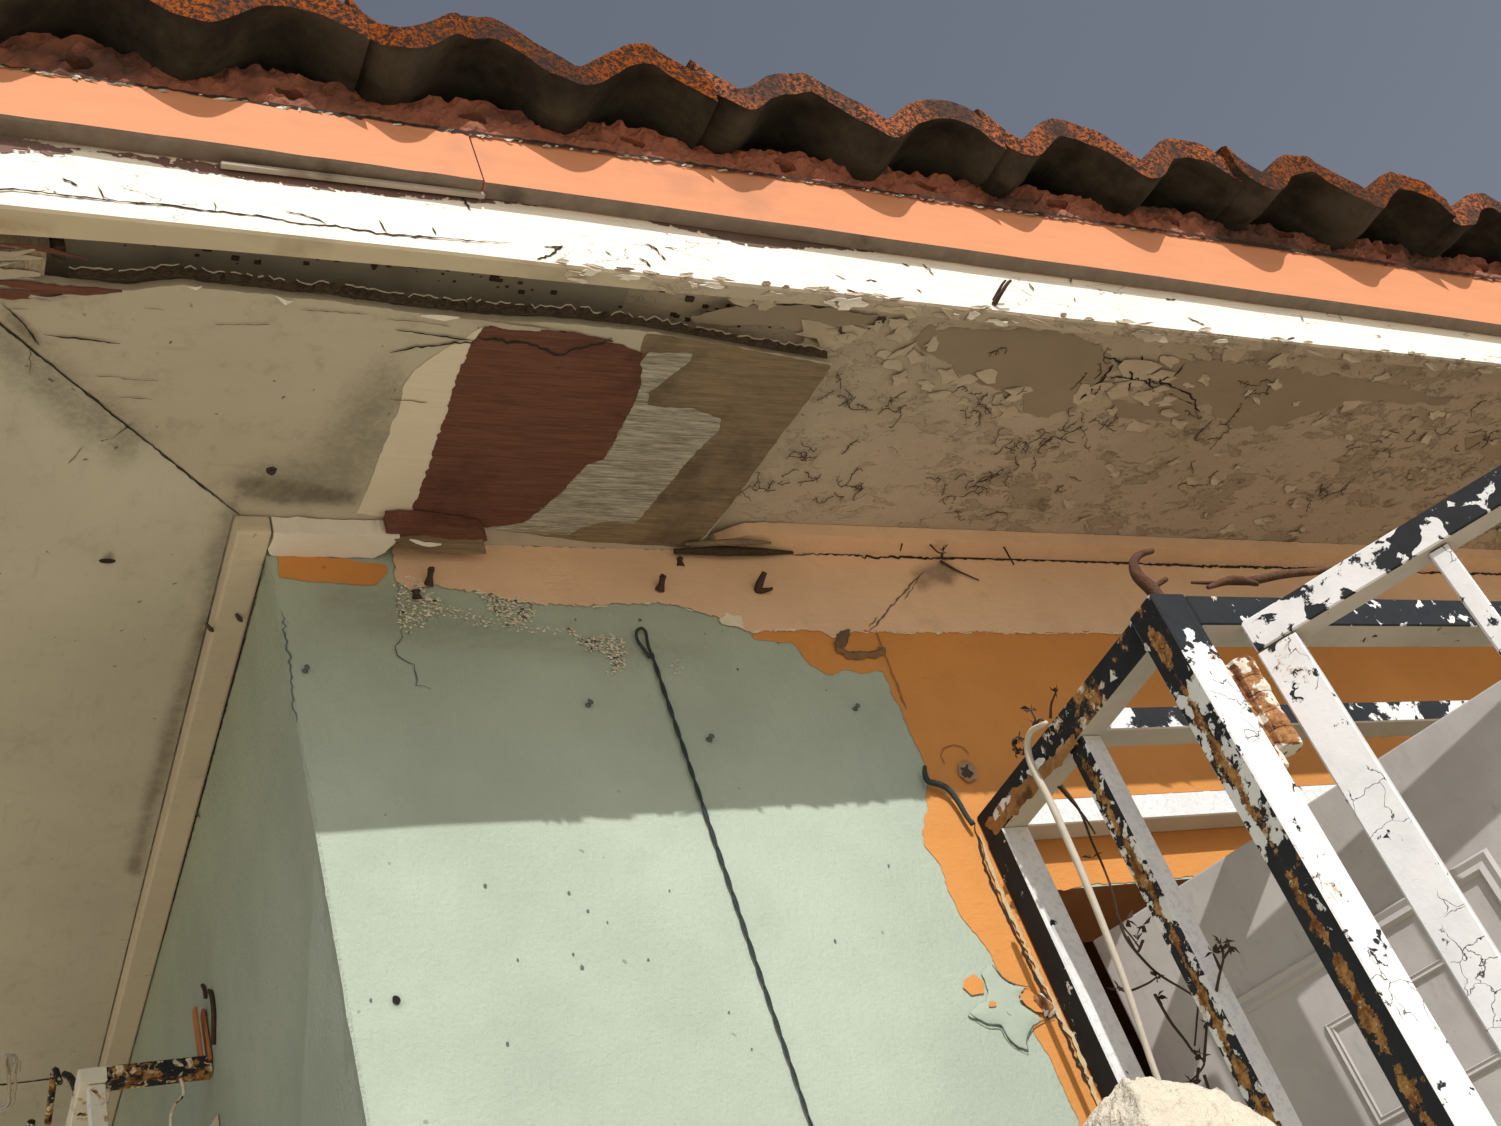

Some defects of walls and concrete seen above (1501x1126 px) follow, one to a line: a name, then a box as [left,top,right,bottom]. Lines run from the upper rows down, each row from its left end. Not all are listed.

peeling [0,134,536,206]
crack [0,64,1501,280]
crack [307,310,475,341]
peeling [357,327,721,536]
peeling [648,220,881,253]
crack [837,263,934,293]
peeling [554,258,1452,452]
crack [1080,356,1200,412]
peeling [393,576,628,676]
crack [0,305,297,1065]
spalling [958,760,978,782]
corrosion [985,734,1078,835]